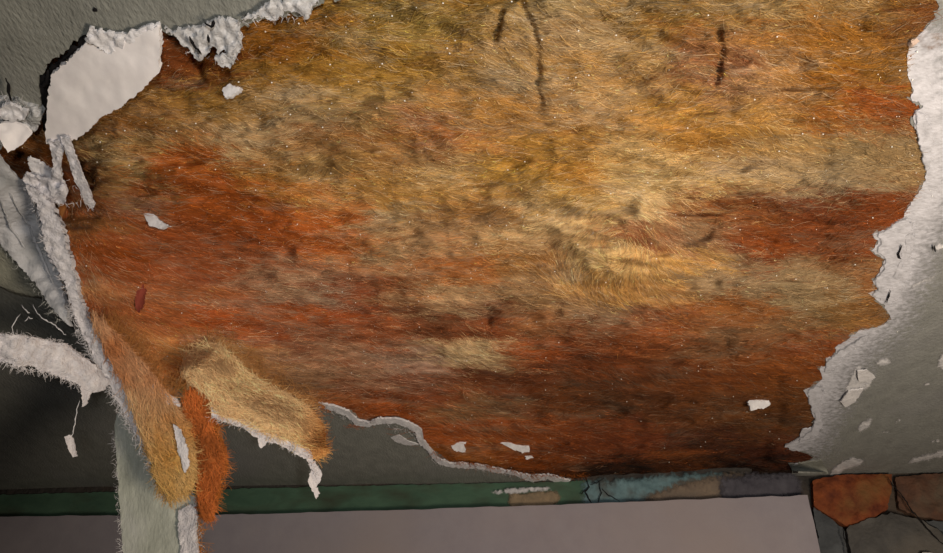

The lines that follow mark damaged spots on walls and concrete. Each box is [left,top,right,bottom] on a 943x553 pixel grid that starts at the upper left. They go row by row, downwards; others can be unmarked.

spalling [222,83,243,100]
flaking render [0,21,164,211]
spalling [144,212,172,230]
peeling [840,358,890,407]
spalling [747,400,770,411]
peeling [390,435,419,446]
spalling [452,442,466,452]
spalling [501,442,533,460]
peeling [830,457,863,476]
peeling [495,487,560,506]
crack [887,476,943,544]